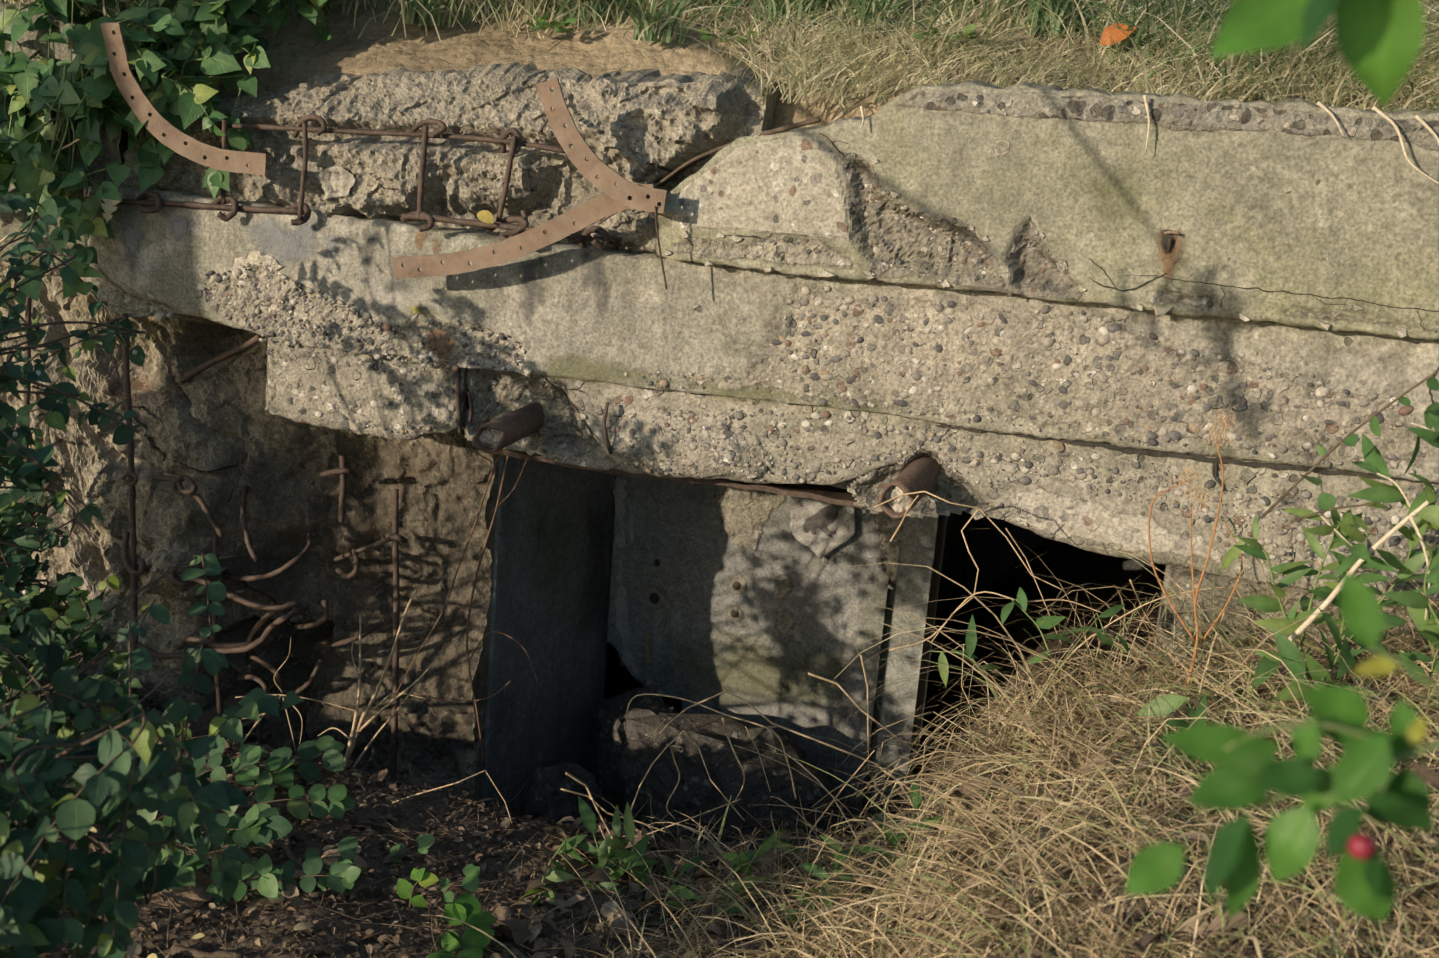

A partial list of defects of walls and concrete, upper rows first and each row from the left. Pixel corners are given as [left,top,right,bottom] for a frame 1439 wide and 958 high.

spalling [83,98,567,241]
spalling [180,135,1439,595]
crack [1088,258,1439,330]